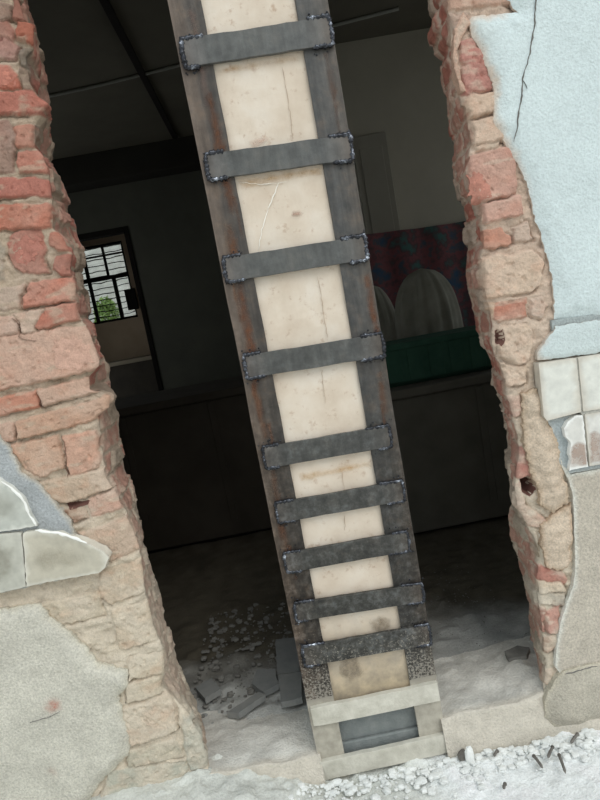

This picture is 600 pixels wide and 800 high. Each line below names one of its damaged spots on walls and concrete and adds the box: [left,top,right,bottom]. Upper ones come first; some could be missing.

spalling [0,0,208,797]
spalling [447,0,588,689]
crack [514,0,537,139]
spalling [561,412,600,510]